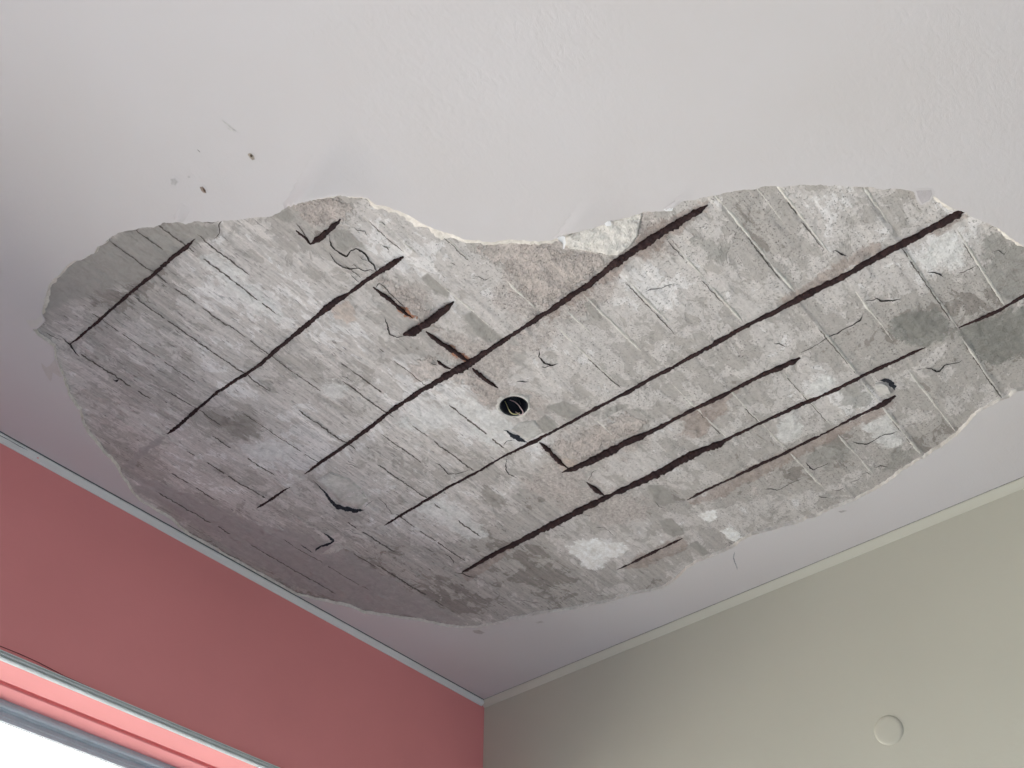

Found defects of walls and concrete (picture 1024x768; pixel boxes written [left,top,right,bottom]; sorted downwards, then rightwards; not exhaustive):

crack [296,222,406,338]
corrosion [519,196,717,337]
corrosion [328,297,360,325]
spalling [32,184,1024,628]
corrosion [671,386,742,444]
corrosion [553,451,582,473]
corrosion [686,397,898,506]
corrosion [459,541,518,583]
corrosion [620,535,691,572]